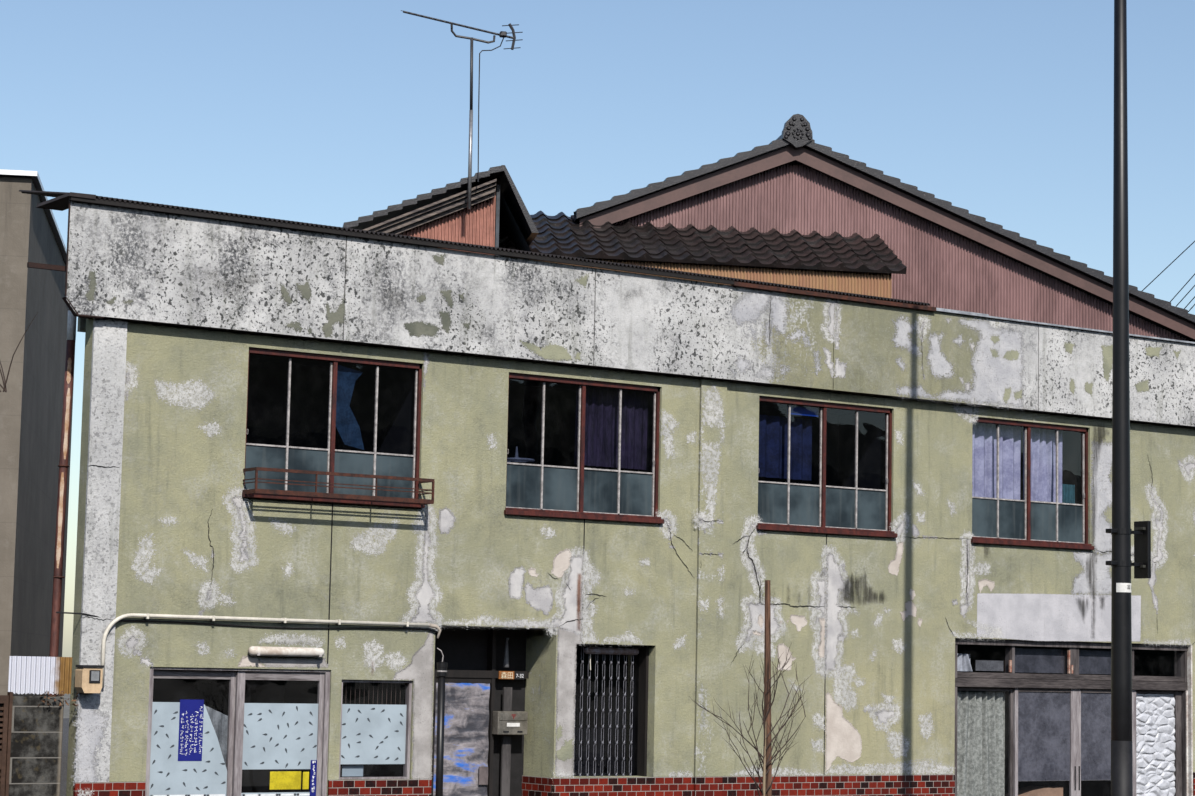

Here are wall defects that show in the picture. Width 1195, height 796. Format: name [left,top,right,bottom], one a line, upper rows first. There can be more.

peeling [154,377,223,438]
peeling [727,289,847,380]
peeling [891,312,1026,425]
crack [207,509,215,587]
peeling [222,485,298,573]
peeling [349,504,644,779]
peeling [656,383,726,549]
crack [666,520,854,608]
peeling [697,511,954,776]
leakage [844,578,884,601]
peeling [1071,439,1112,598]
peeling [1145,481,1170,614]